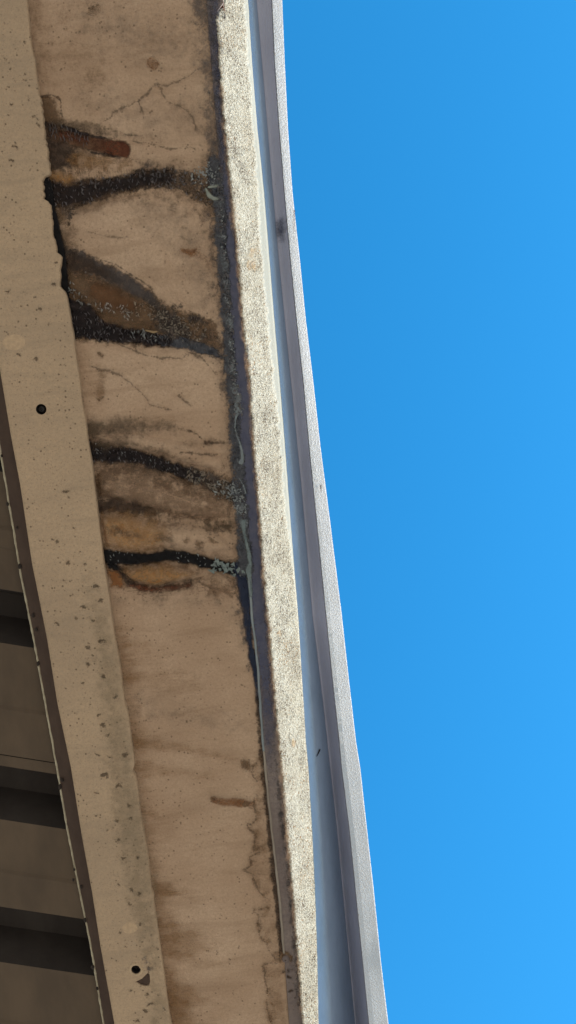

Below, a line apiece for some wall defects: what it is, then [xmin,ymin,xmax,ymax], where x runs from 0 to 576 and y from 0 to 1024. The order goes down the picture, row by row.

rust [45,120,131,183]
leakage [44,0,275,753]
rust [211,797,254,807]
leakage [287,880,301,1006]